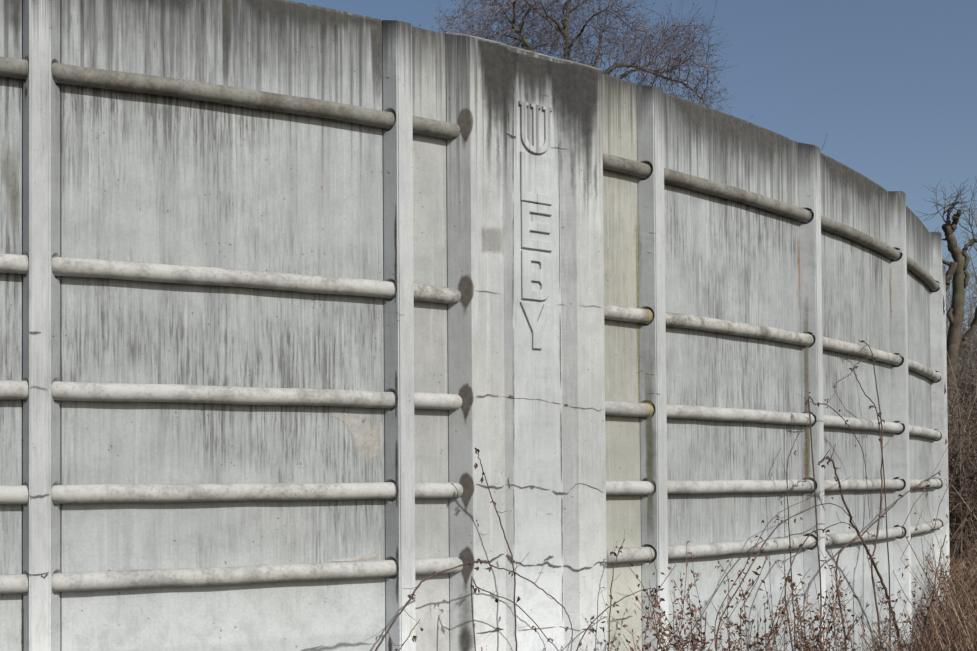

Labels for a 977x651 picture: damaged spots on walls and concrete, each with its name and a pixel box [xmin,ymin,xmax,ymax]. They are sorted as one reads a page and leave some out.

damp [223,0,232,65]
damp [249,0,382,70]
damp [479,40,599,165]
crack [476,81,516,305]
crack [551,147,563,256]
crack [559,304,599,370]
crack [477,394,606,602]
crack [18,600,26,651]
crack [301,637,392,651]
crack [477,626,594,634]